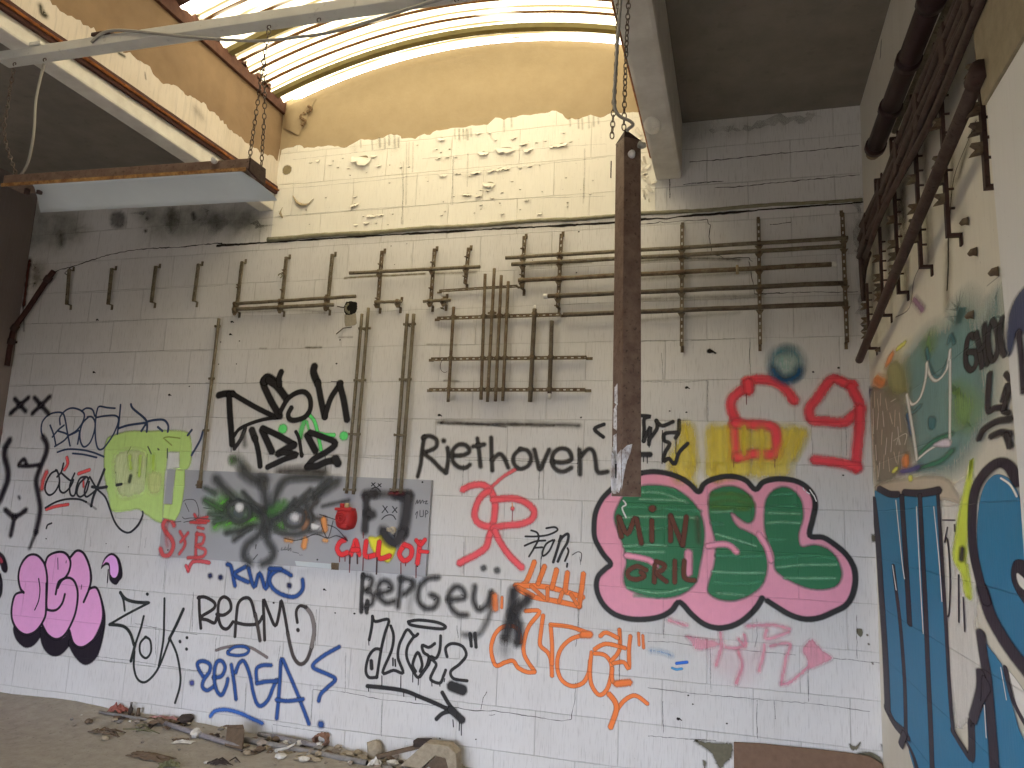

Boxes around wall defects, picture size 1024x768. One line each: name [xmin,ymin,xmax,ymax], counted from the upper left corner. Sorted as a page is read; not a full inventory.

peeling [10,0,96,41]
peeling [91,52,657,237]
crack [55,221,615,275]
crack [641,145,863,294]